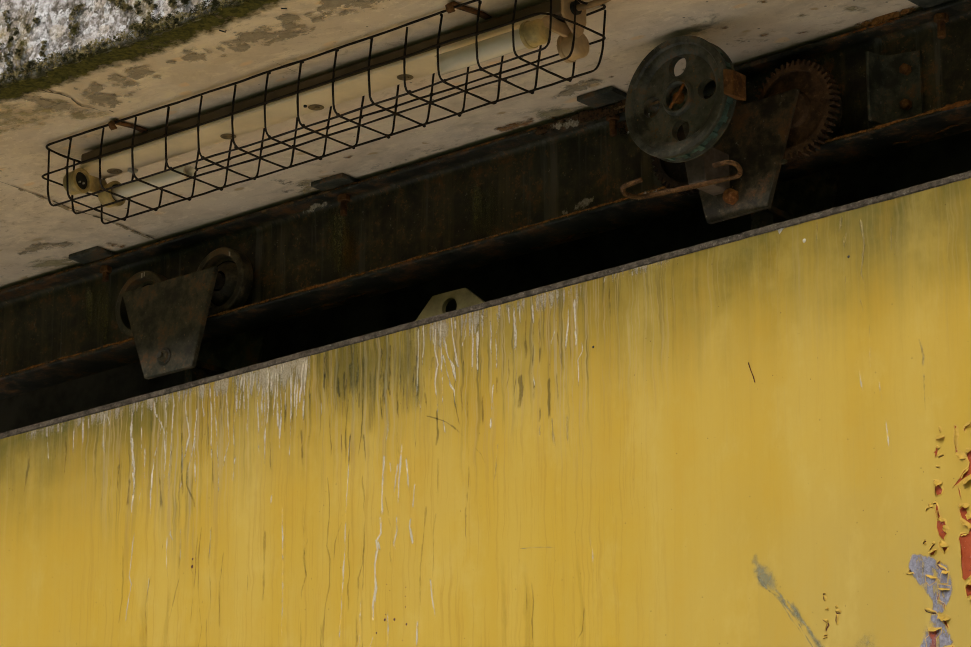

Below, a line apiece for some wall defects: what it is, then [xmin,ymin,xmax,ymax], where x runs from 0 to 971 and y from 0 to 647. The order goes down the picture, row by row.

rust [833,7,915,39]
rust [415,99,629,165]
rust [819,99,971,145]
crack [2,182,160,241]
rust [207,186,665,318]
damp [417,290,583,411]
damp [73,408,119,449]
damp [130,356,310,512]
peeling [925,421,971,647]